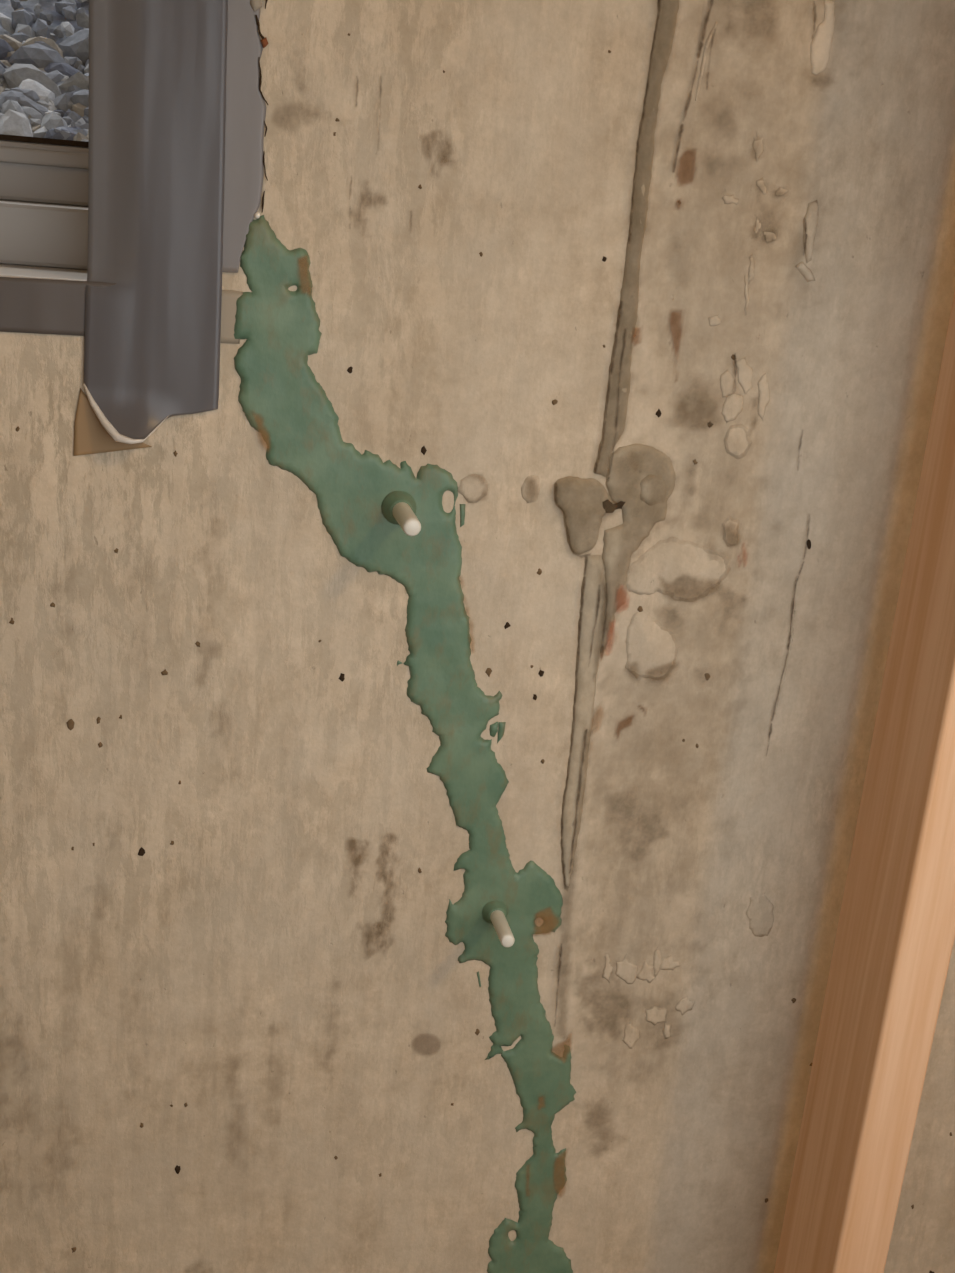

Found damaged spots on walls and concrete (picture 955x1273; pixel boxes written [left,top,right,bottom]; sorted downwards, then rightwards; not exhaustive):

peeling [810,0,835,75]
peeling [720,357,770,423]
peeling [602,946,680,984]
peeling [622,997,695,1049]